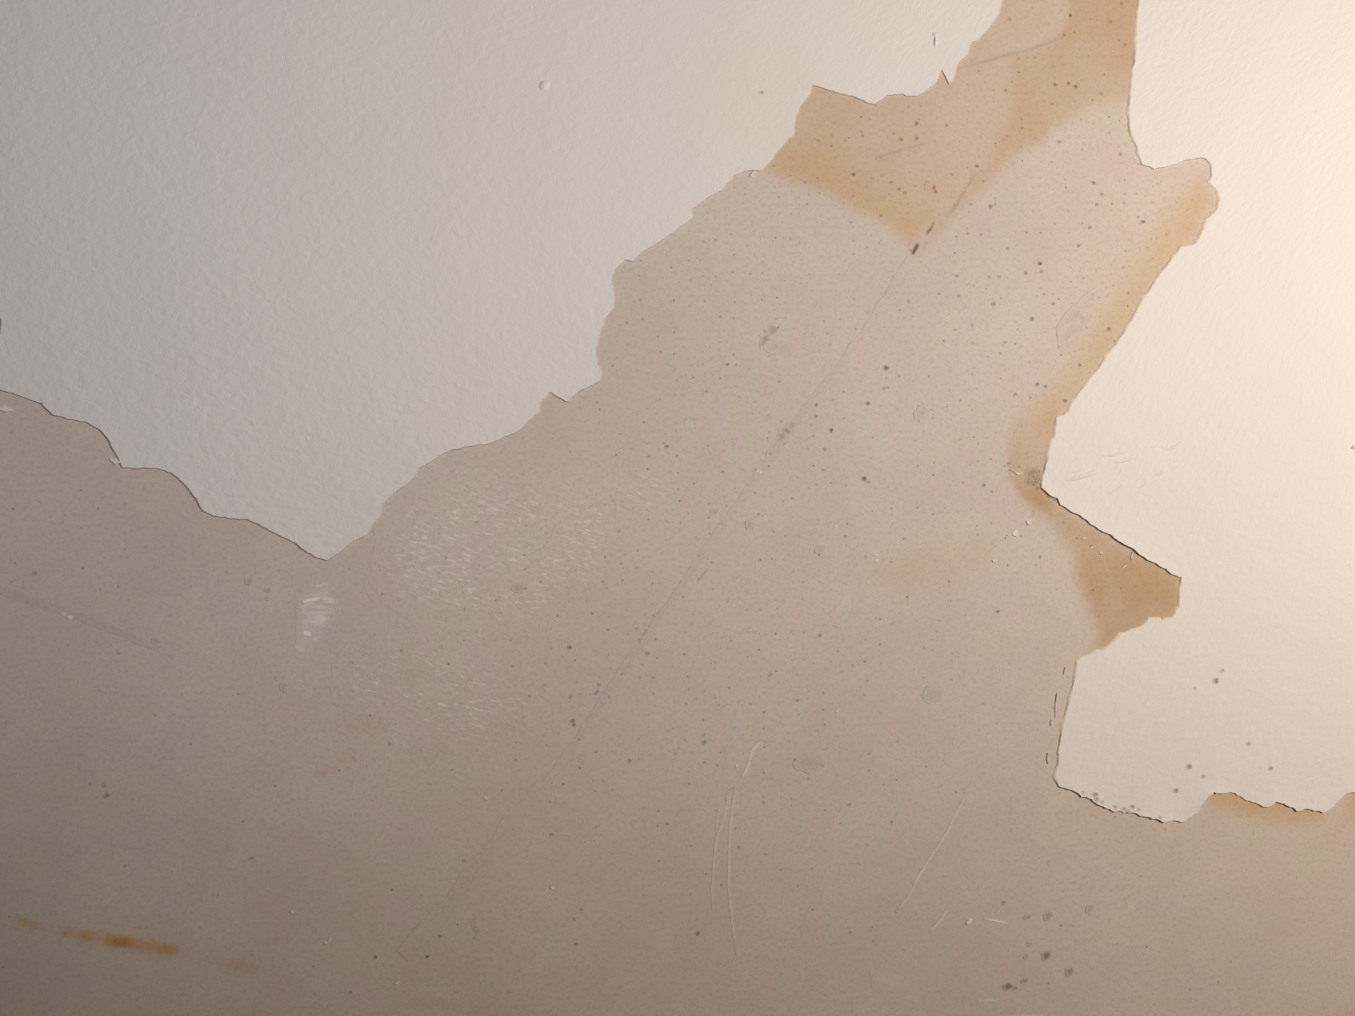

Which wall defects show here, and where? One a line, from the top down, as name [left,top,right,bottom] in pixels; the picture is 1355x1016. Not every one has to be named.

peeling [794,0,1003,125]
damp [755,0,1137,263]
peeling [1125,0,1142,165]
peeling [1040,159,1220,577]
peeling [1052,577,1182,786]
damp [1202,793,1355,837]
peeling [1214,792,1354,821]